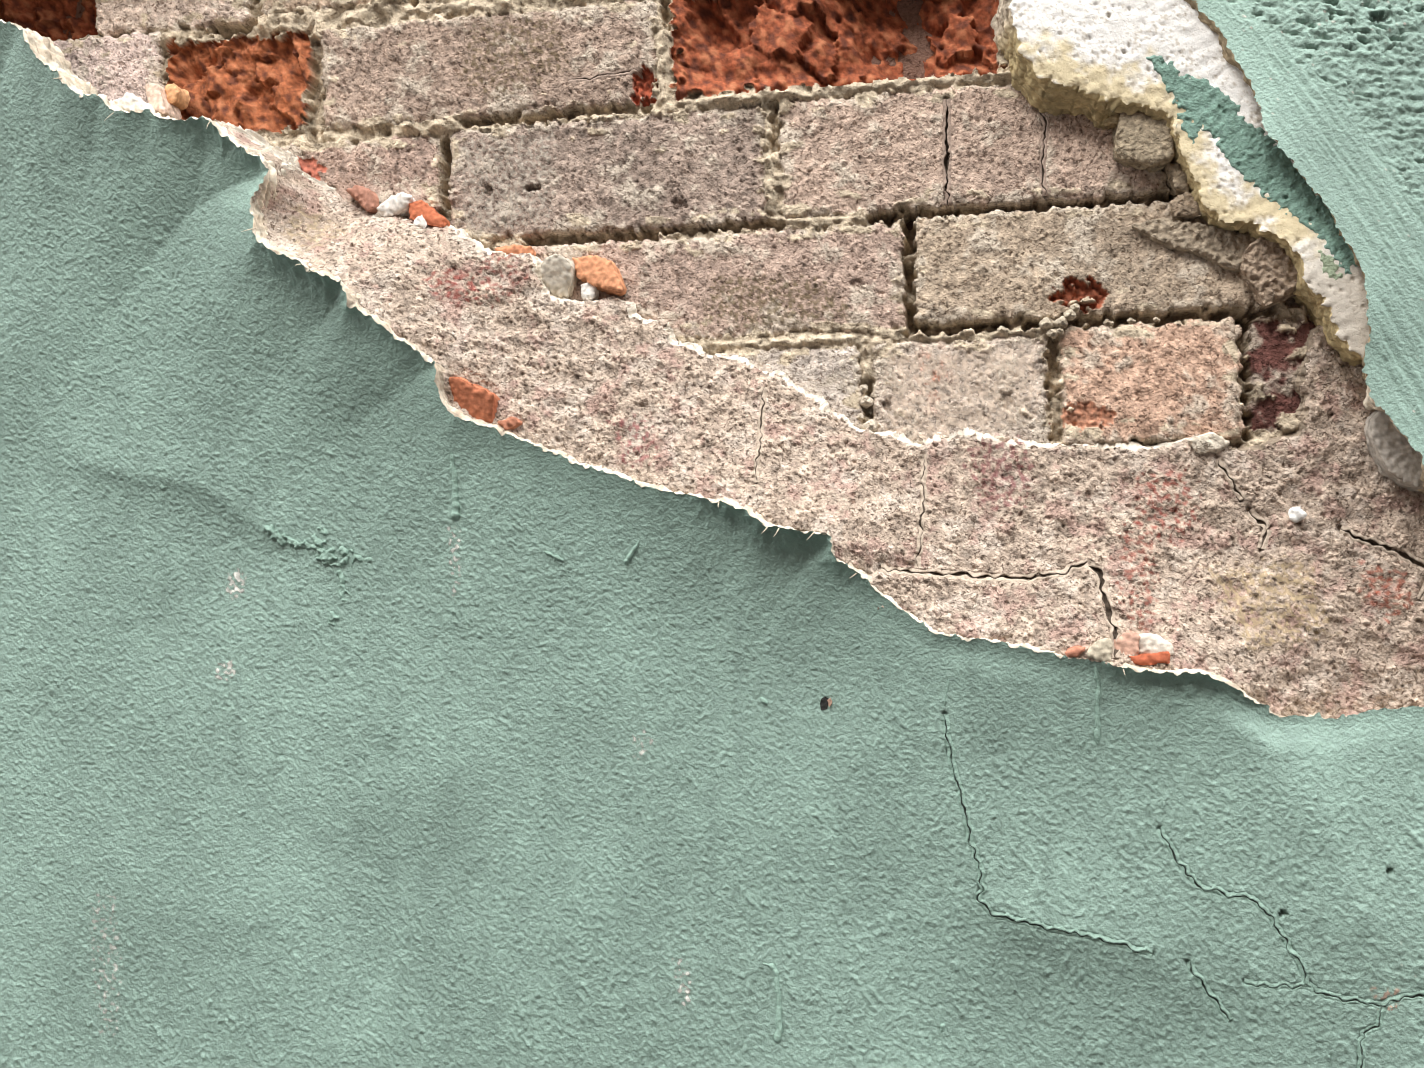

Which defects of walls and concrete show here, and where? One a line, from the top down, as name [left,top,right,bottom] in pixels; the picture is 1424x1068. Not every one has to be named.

spalling [0,0,1424,719]
crack [940,714,1153,957]
crack [1156,826,1424,1068]